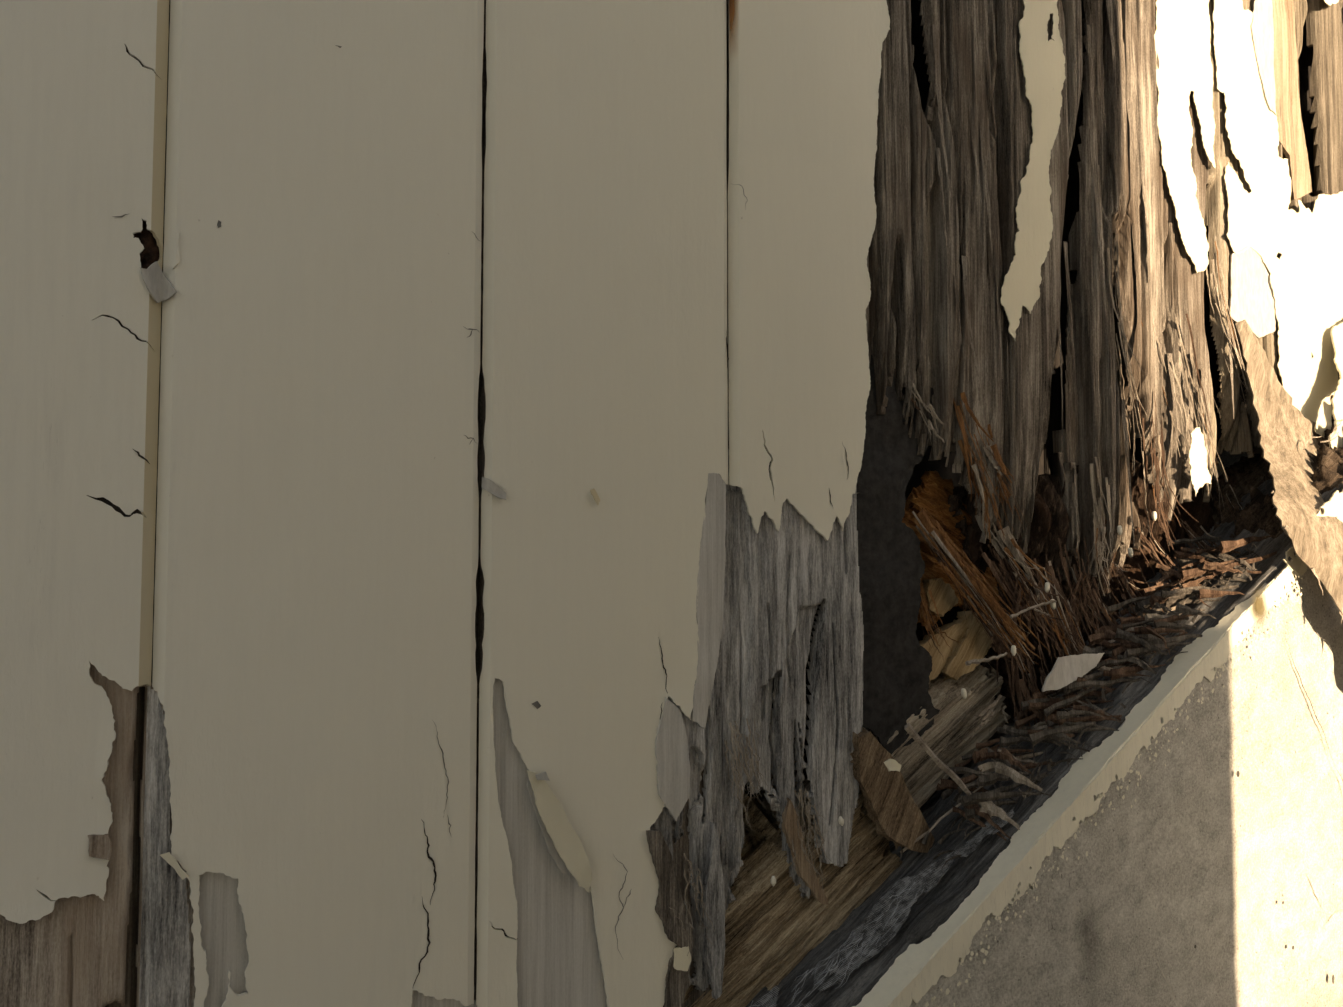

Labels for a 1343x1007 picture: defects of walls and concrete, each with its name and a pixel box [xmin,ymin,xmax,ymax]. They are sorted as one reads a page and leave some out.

crack [101,315,146,342]
peeling [865,0,1343,623]
crack [86,495,142,517]
peeling [0,661,249,1007]
crack [413,721,451,986]
peeling [493,678,607,1007]
peeling [646,449,864,1007]
peeling [884,759,901,772]
peeling [411,990,477,1007]